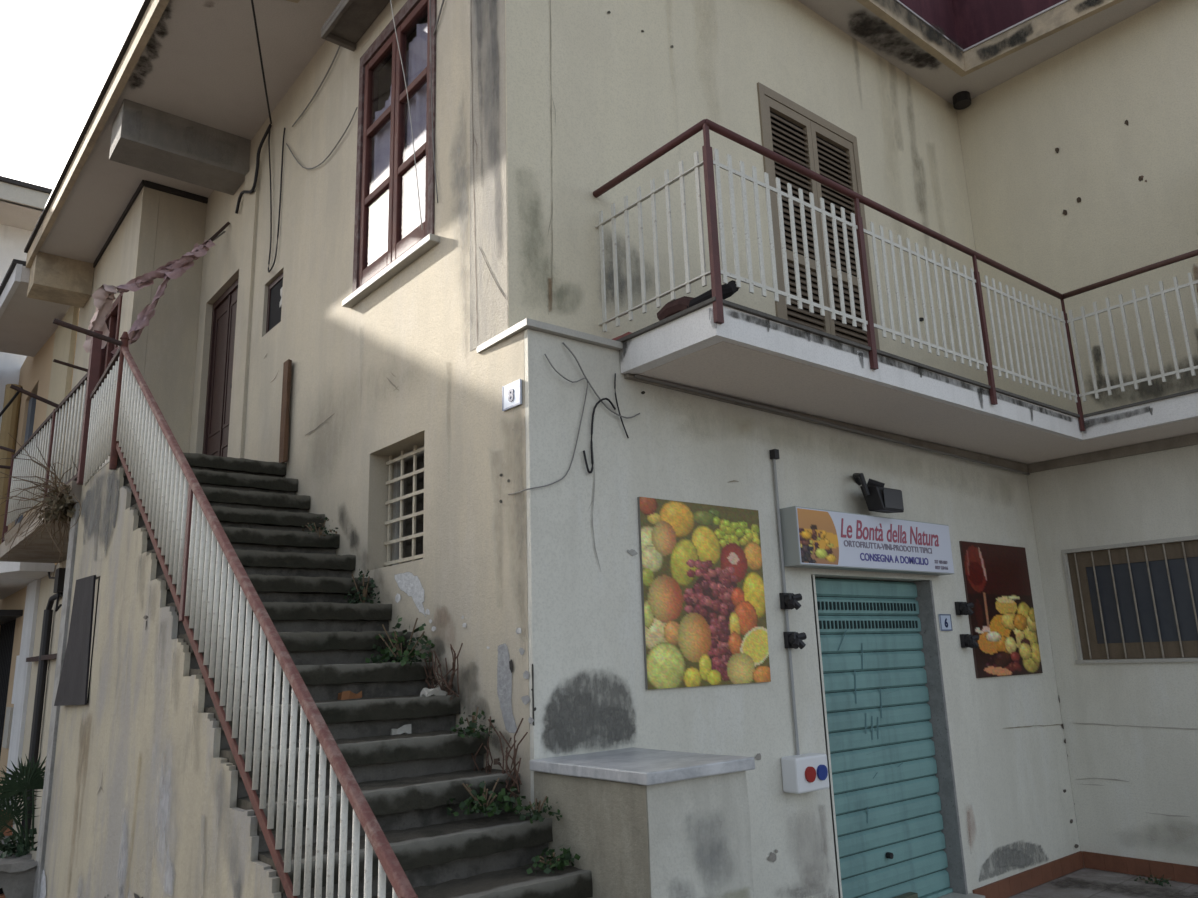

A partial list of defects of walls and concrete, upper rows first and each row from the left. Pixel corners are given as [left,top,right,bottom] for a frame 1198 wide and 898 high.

leakage [851,0,962,68]
leakage [978,25,1032,59]
leakage [1075,0,1101,10]
leakage [81,470,119,560]
peeling [394,572,436,632]
peeling [487,628,536,733]
leakage [544,673,635,751]
leakage [979,842,1048,881]